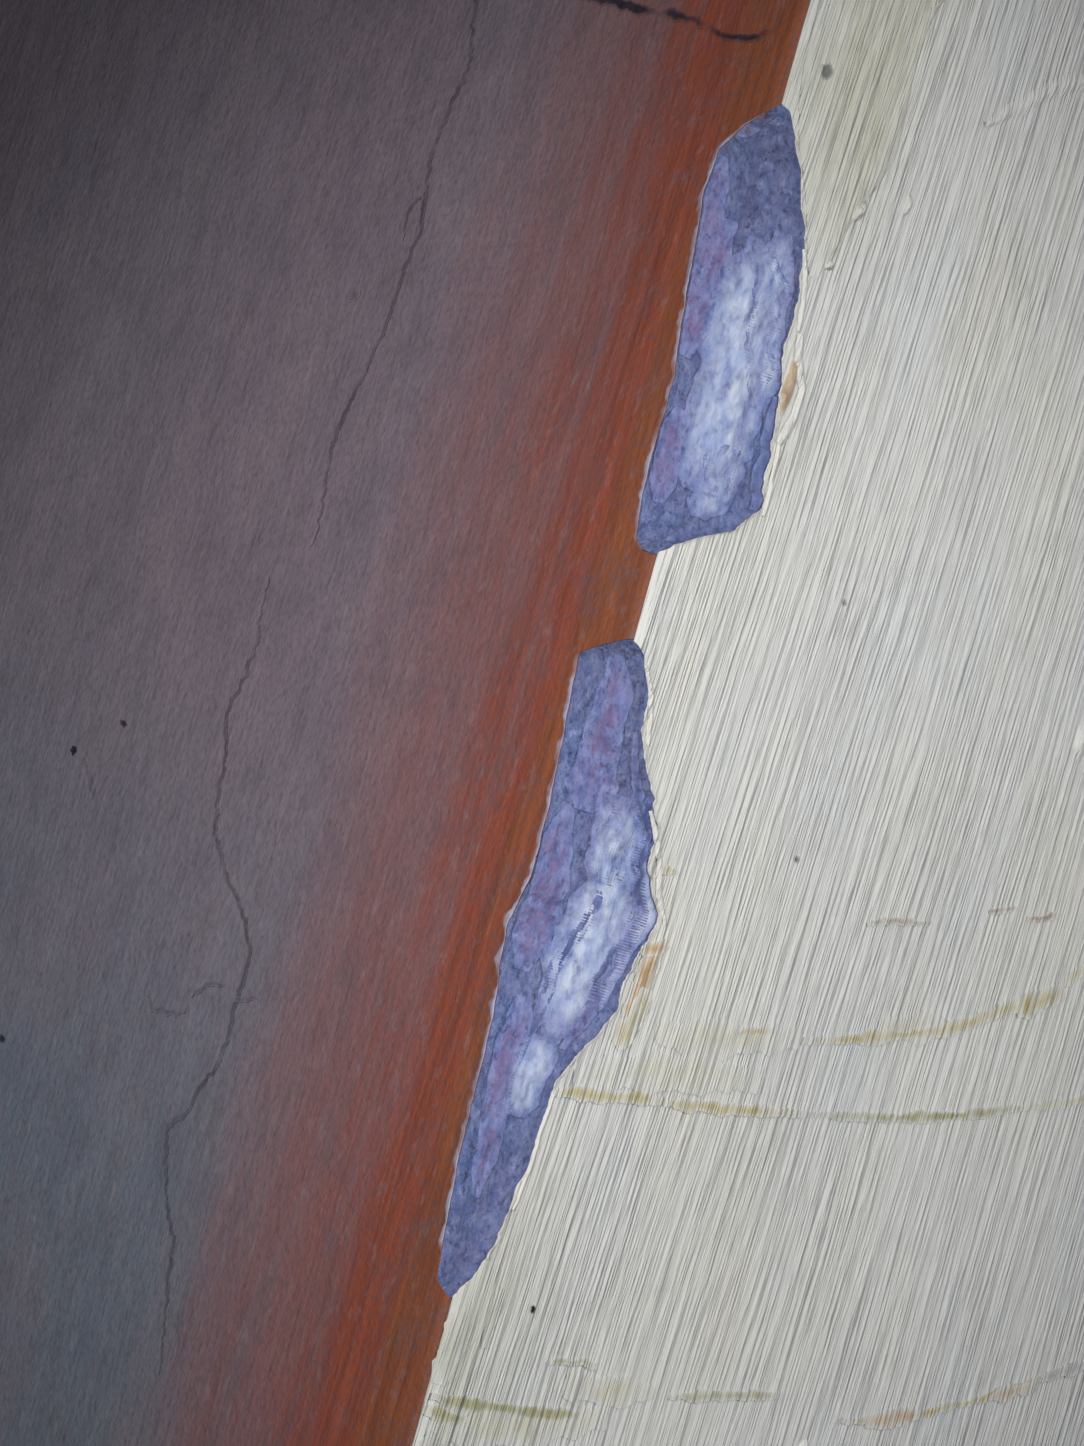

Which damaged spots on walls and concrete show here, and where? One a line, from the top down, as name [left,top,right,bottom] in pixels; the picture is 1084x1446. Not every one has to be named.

crack [309,0,478,546]
crack [586,0,772,43]
spalling [632,0,944,554]
crack [145,576,269,1374]
spalling [437,639,666,1298]
rust [611,939,669,1051]